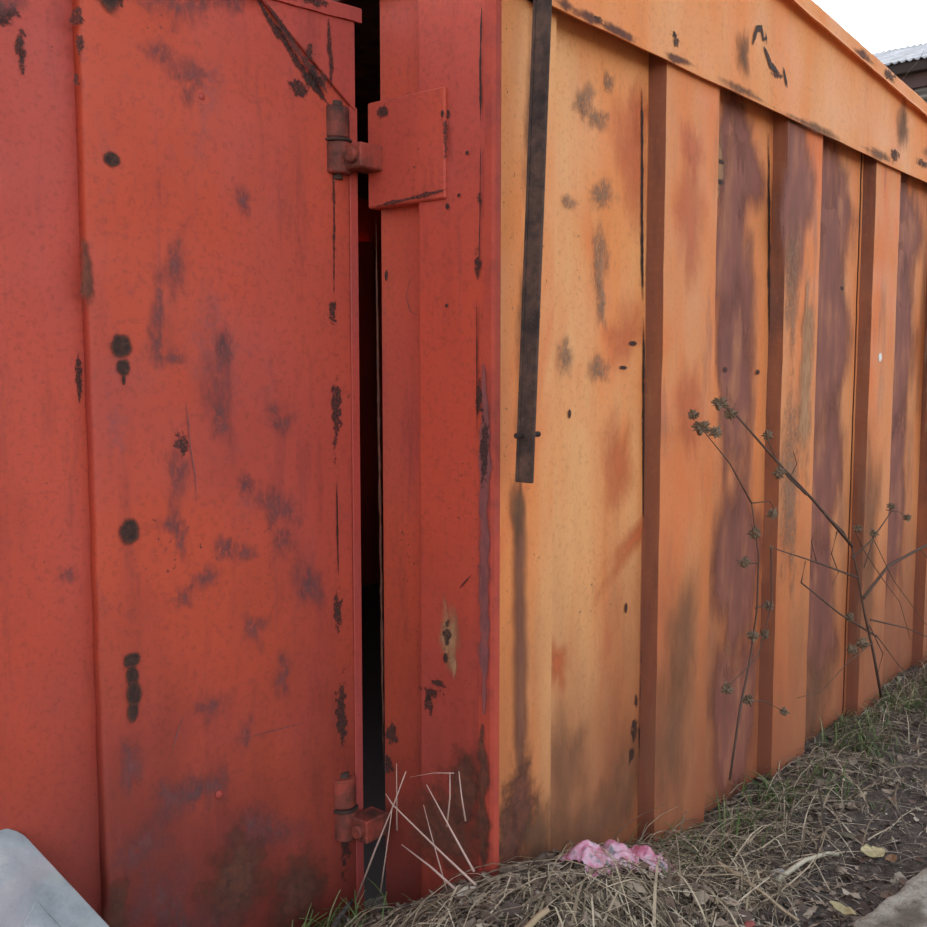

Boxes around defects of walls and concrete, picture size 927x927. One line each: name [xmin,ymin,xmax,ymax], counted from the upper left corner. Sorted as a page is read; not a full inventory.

corrosion [739,41,748,70]
corrosion [111,334,132,385]
corrosion [119,519,139,544]
corrosion [124,653,142,723]
corrosion [414,486,548,868]